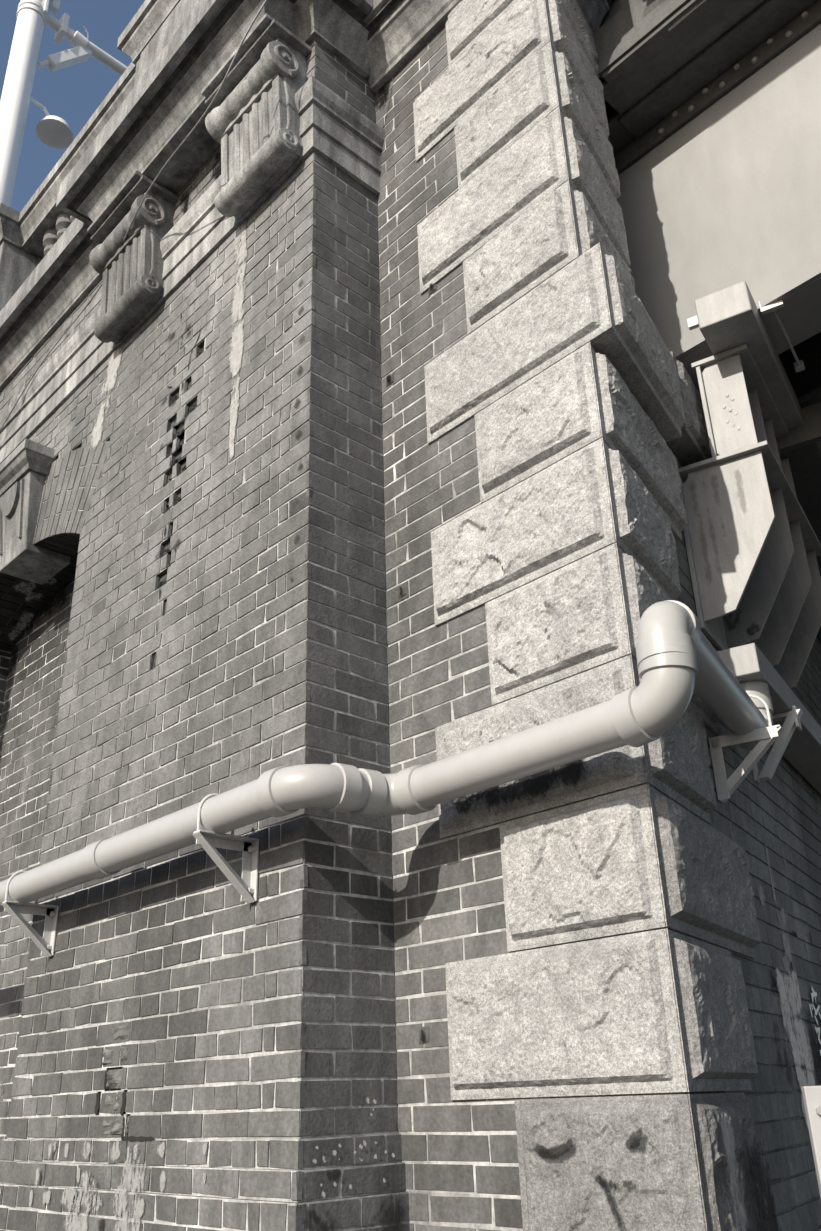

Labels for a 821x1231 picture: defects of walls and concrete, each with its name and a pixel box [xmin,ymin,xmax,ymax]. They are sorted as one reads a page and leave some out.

water stain [91,348,122,449]
water stain [229,226,247,459]
crack [150,314,204,663]
water stain [0,645,18,758]
water stain [759,844,821,1127]
water stain [29,1139,146,1231]
water stain [157,1142,166,1192]